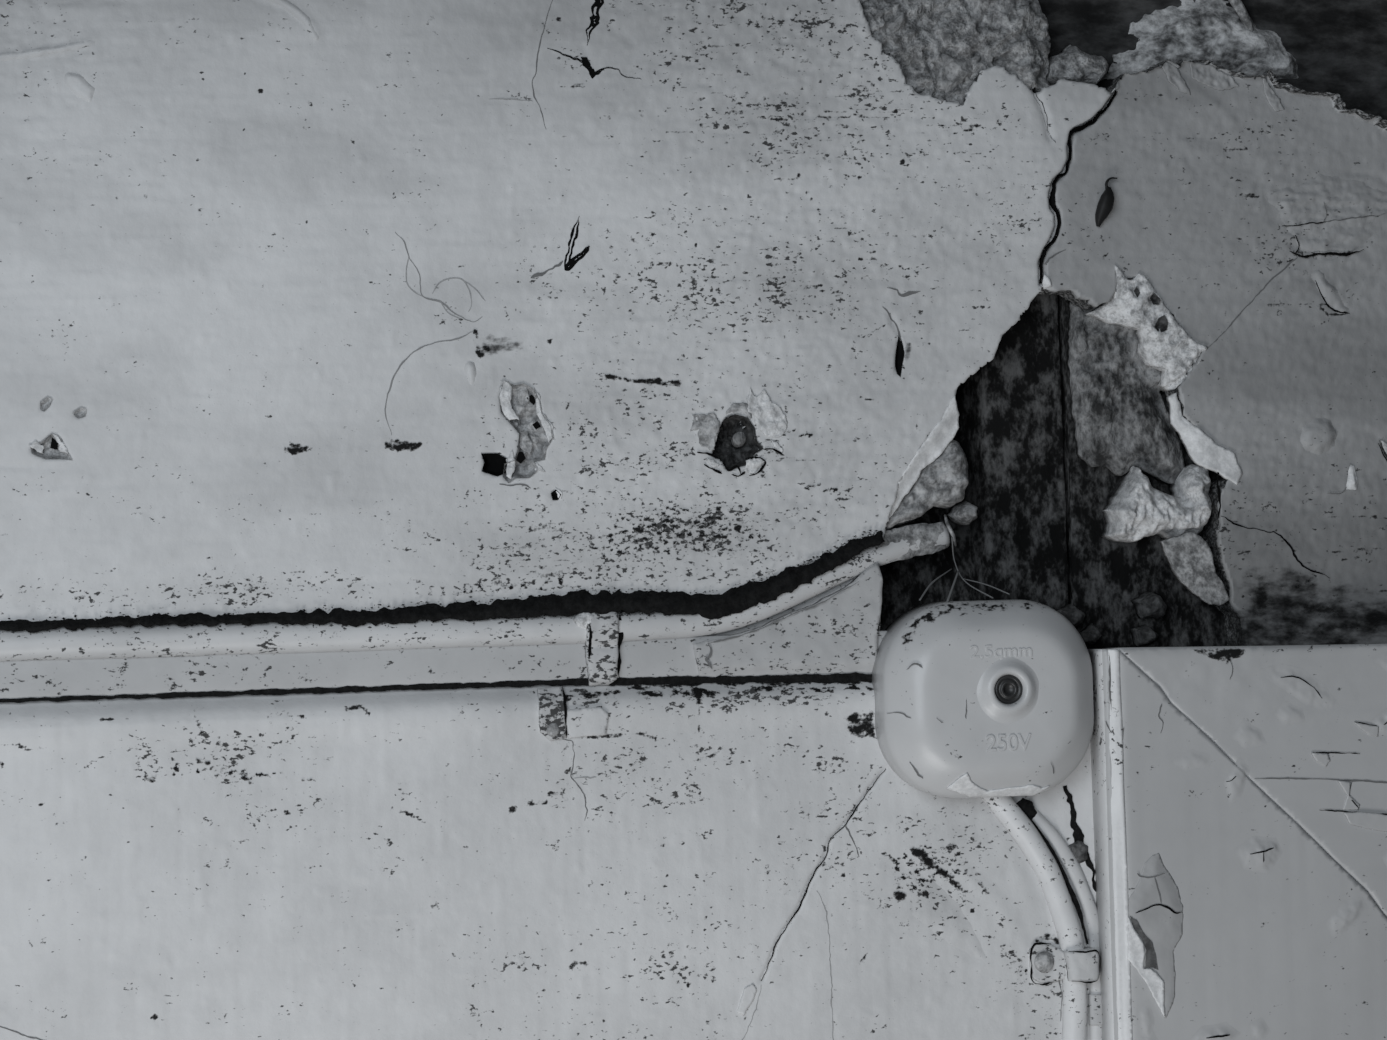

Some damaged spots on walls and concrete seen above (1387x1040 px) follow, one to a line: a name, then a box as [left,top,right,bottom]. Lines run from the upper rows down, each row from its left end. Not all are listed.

crack [494,0,640,128]
spalling [860,0,1051,105]
crack [1031,87,1117,288]
spalling [499,380,554,488]
spalling [885,396,968,530]
spalling [1084,265,1243,485]
flaking render [1160,532,1229,605]
crack [1106,656,1124,733]
crack [1255,776,1387,784]
crack [738,769,886,1040]
peeling [1127,853,1183,1018]
crack [0,1026,42,1040]